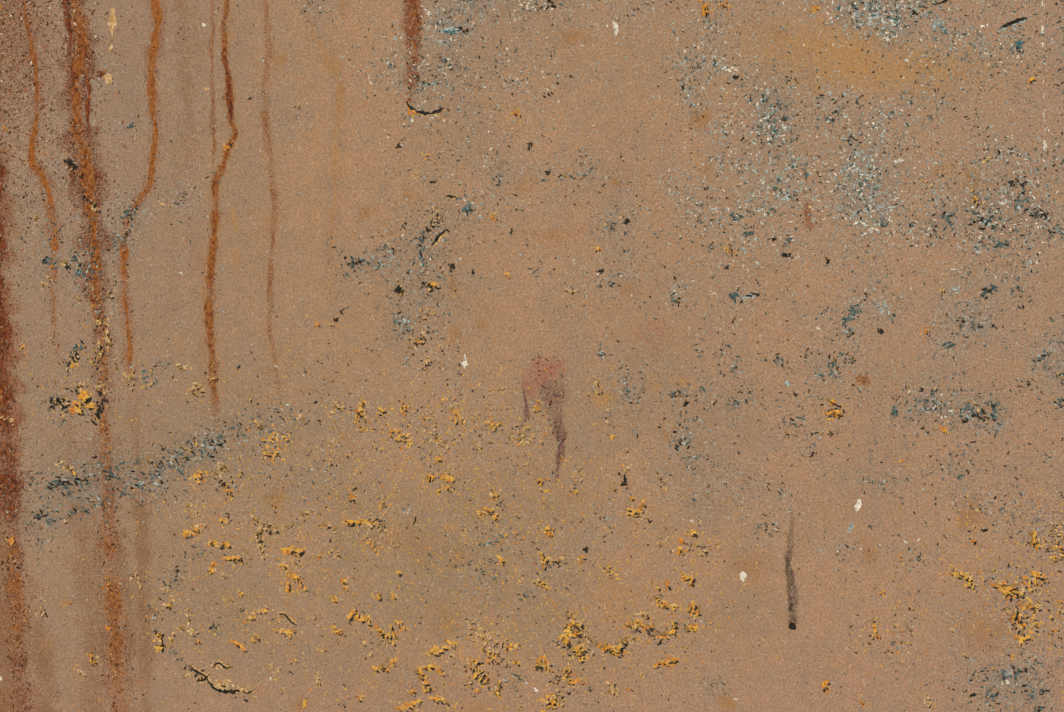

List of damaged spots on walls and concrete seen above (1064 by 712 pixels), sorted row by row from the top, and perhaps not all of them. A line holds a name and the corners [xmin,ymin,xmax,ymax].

leakage [784,507,799,630]
corrosion [848,543,933,712]
corrosion [944,492,1064,664]